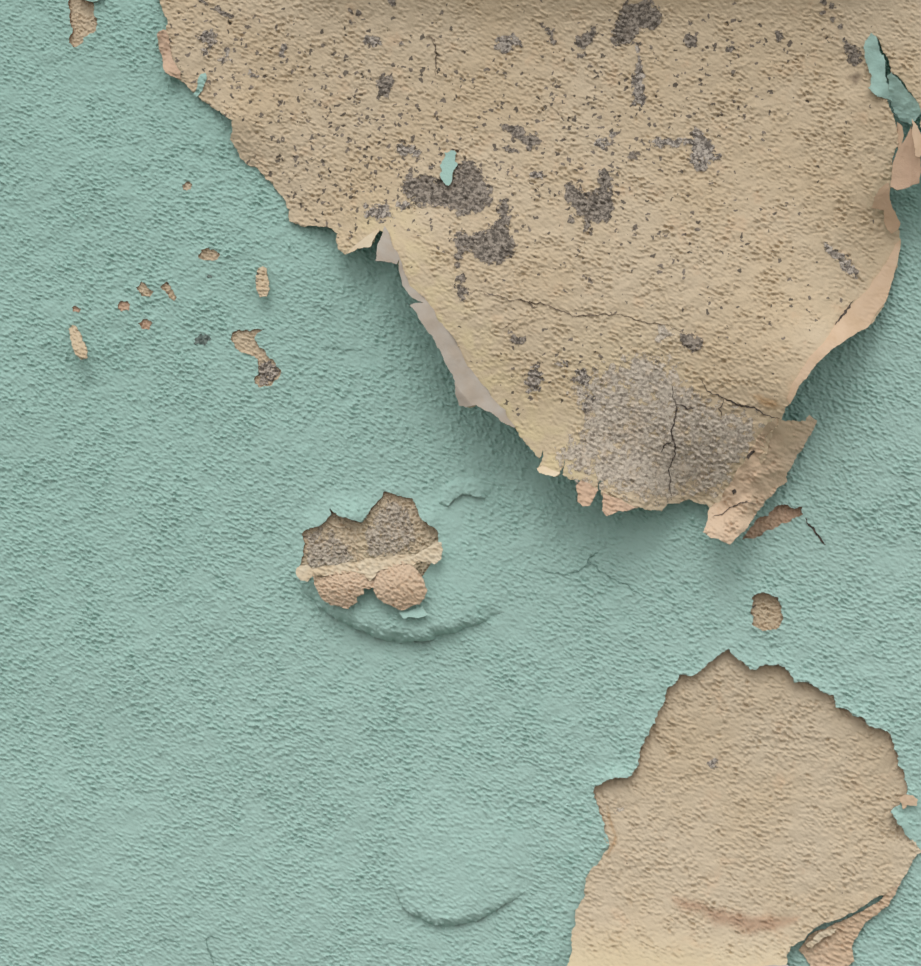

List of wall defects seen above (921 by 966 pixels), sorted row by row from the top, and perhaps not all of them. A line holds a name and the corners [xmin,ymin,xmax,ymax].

peeling [69,0,99,47]
peeling [68,325,88,360]
peeling [137,282,177,301]
peeling [157,0,921,545]
crack [660,381,778,500]
peeling [296,492,443,619]
peeling [751,592,783,631]
peeling [567,649,921,966]